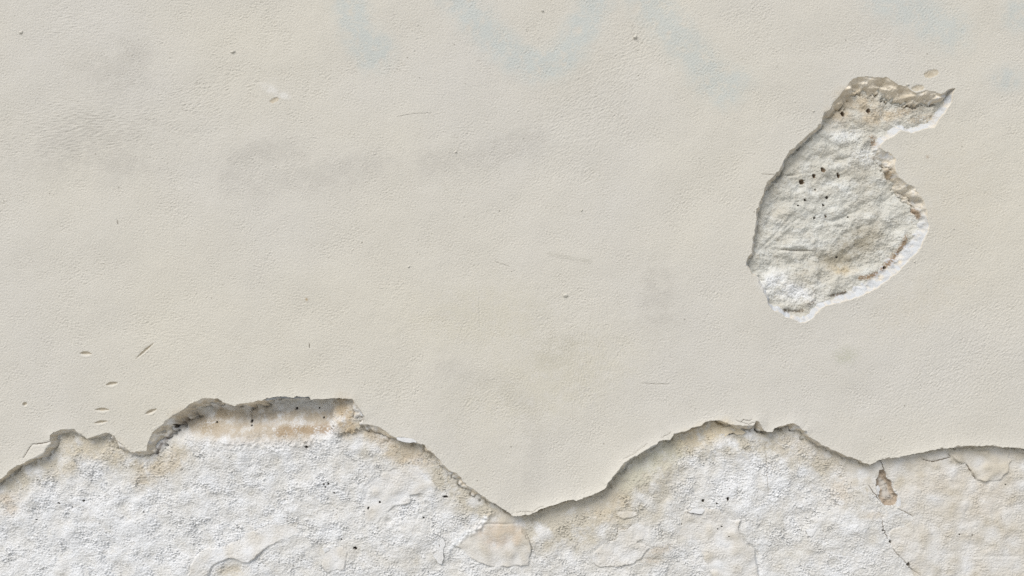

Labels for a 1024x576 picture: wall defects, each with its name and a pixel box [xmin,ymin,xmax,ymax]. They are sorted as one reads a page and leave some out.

spalling [850,69,955,113]
spalling [746,128,916,323]
spalling [245,396,333,418]
spalling [0,421,1024,576]